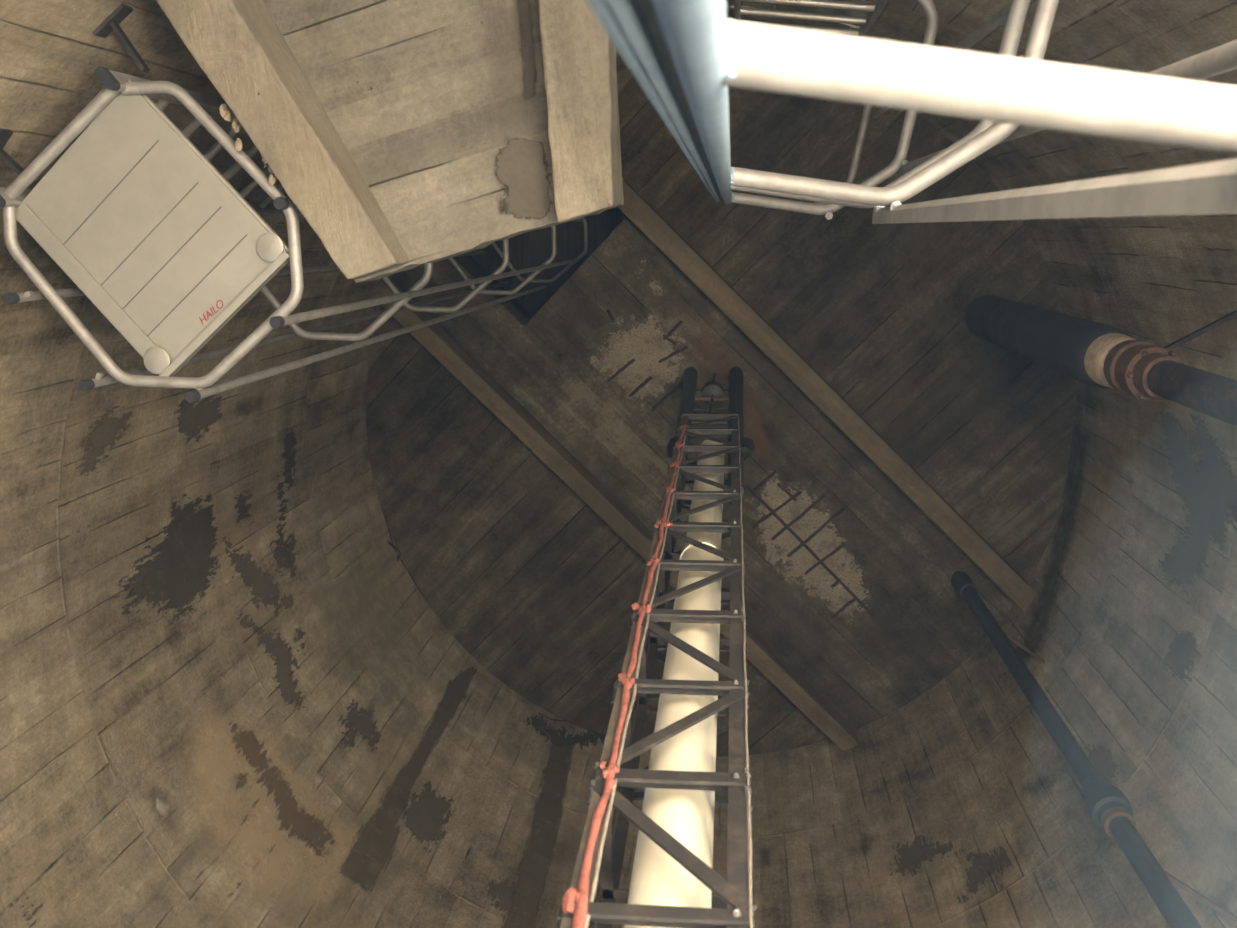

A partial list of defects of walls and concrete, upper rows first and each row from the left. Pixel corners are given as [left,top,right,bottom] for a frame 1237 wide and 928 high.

spalling [496,137,552,220]
spalling [587,278,691,412]
leakage [115,494,219,639]
spalling [745,468,875,625]
leakage [1158,403,1237,593]
leakage [193,667,477,896]